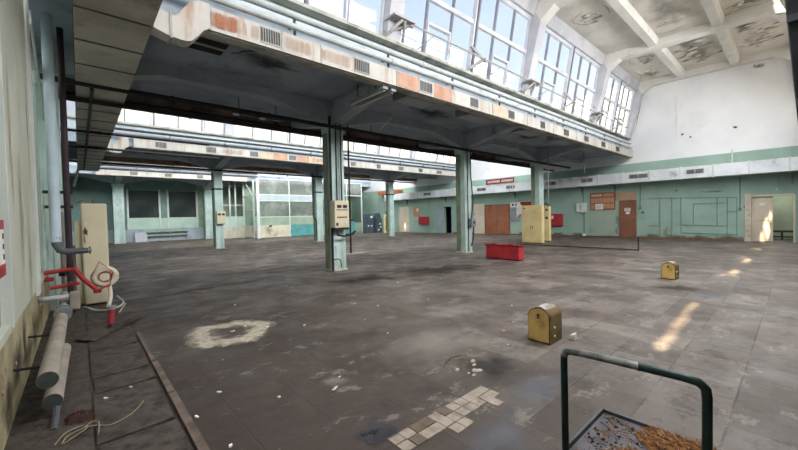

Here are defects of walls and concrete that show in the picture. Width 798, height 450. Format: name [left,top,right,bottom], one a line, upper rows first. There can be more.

peeling [738,22,784,47]
peeling [674,38,722,65]